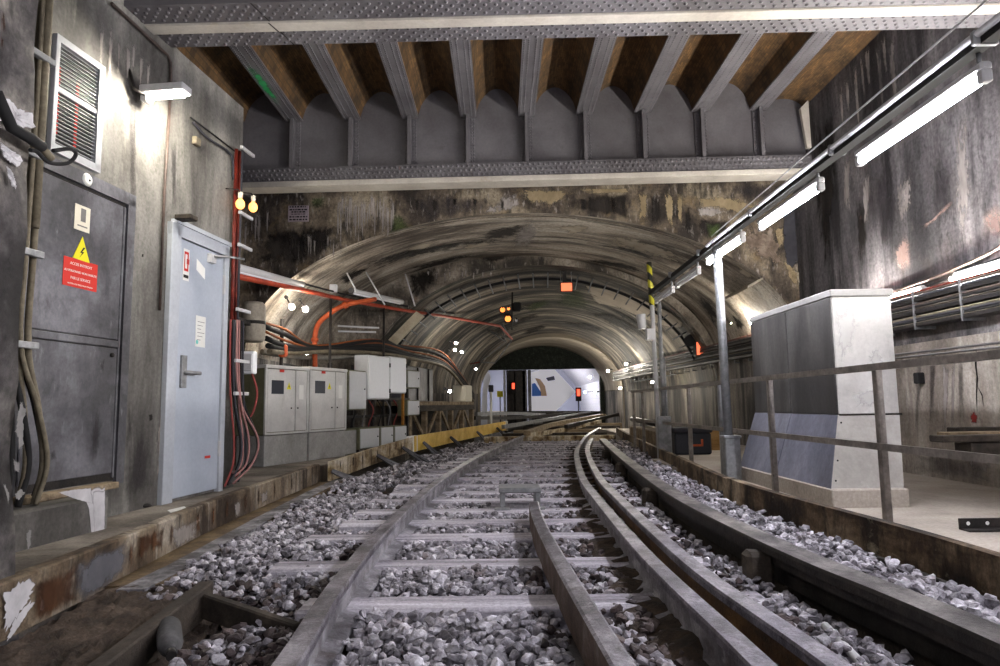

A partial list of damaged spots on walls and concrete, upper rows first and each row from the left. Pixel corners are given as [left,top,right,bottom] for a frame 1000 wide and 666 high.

flaking render [6,99,36,128]
damp [816,40,897,155]
flaking render [0,142,23,189]
damp [937,124,969,227]
damp [244,197,394,262]
damp [416,196,519,216]
damp [580,194,727,236]
damp [817,162,910,263]
peeling [58,488,105,532]
rust [129,526,173,562]
peeling [3,579,35,641]
rust [36,569,74,619]